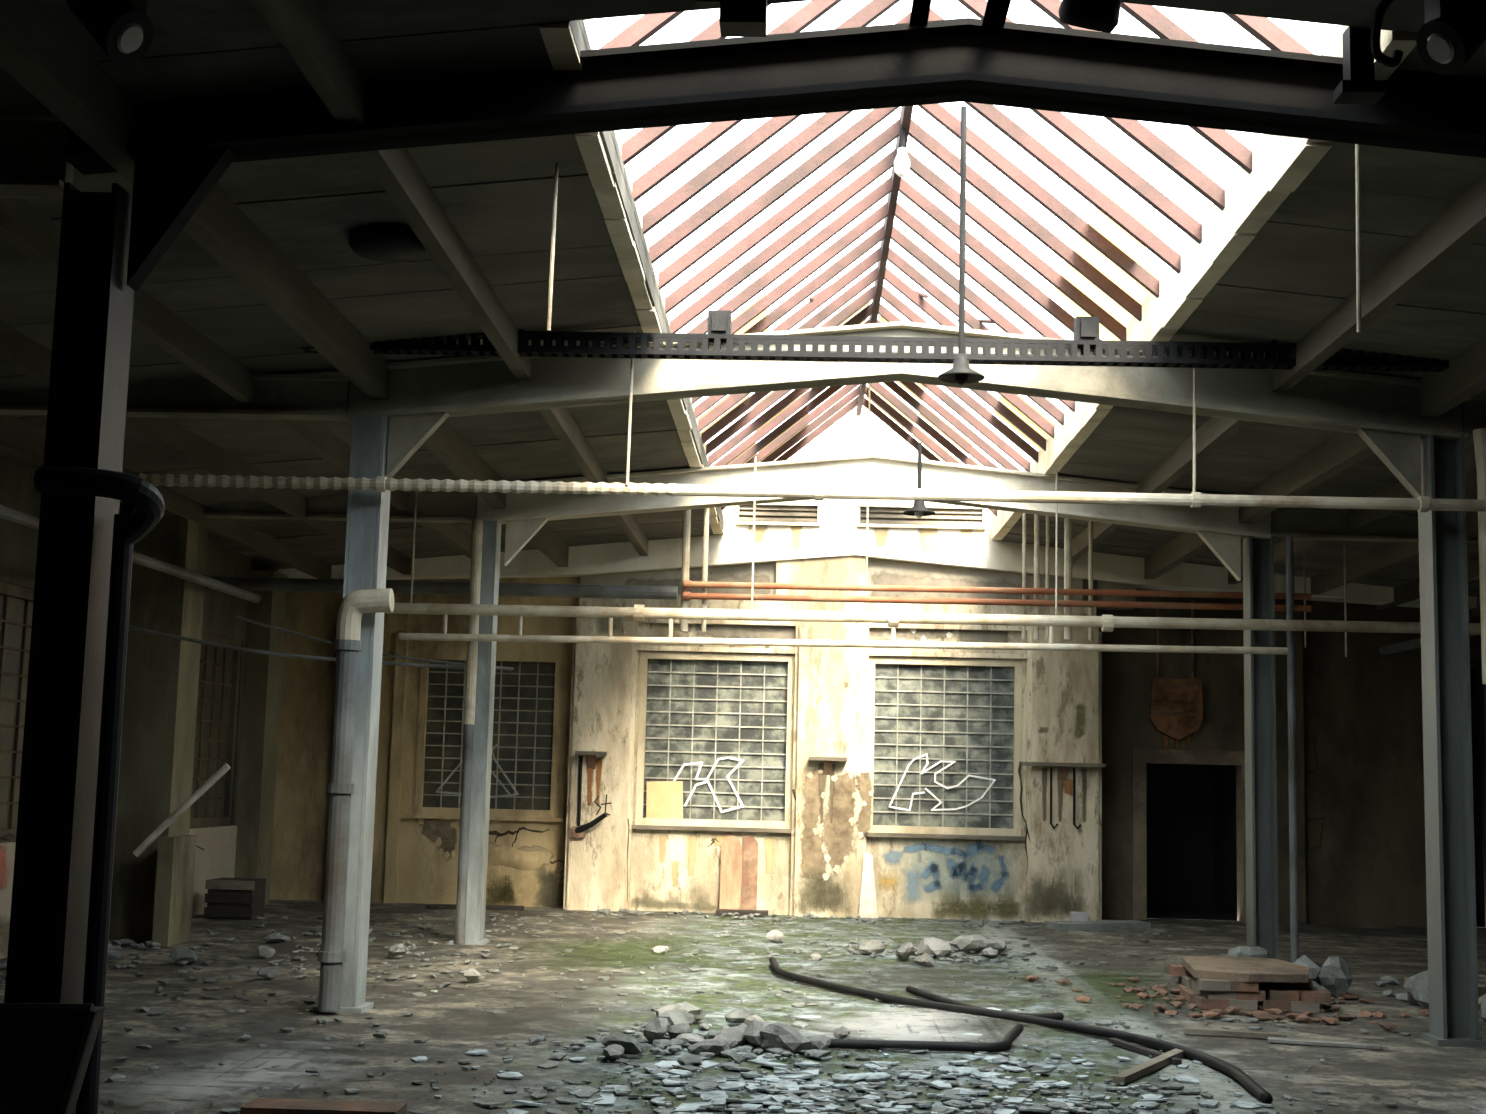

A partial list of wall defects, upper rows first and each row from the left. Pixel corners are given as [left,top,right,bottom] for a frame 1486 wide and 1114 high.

corrosion [587,758,602,805]
corrosion [1042,768,1087,822]
peeling [800,769,874,880]